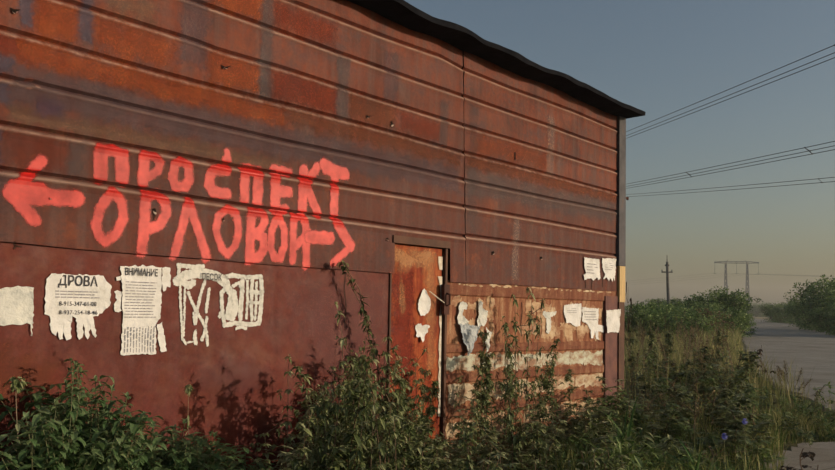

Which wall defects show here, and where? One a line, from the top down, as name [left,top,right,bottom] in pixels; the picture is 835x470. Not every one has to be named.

corrosion [0,0,285,125]
corrosion [390,249,431,385]
peeling [446,283,603,406]
peeling [445,411,505,439]
peeling [523,398,602,427]